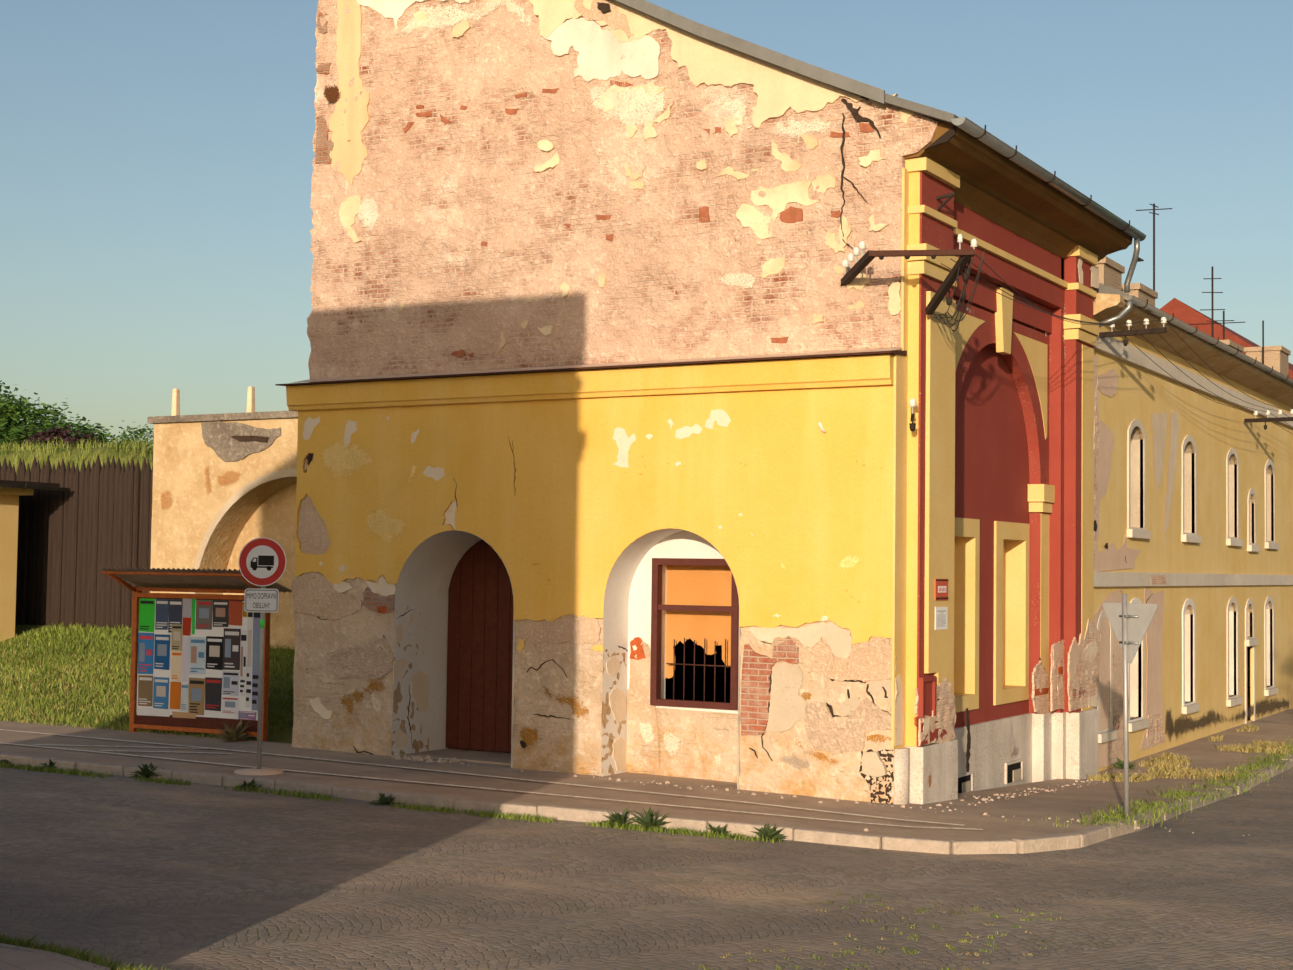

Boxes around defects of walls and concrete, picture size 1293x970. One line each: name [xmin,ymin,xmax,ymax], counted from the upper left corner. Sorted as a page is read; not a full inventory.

flaking render [307,0,939,382]
crack [840,96,881,248]
peeling [612,427,653,468]
peeling [667,409,731,439]
flaking render [1094,355,1141,572]
flaking render [290,494,429,757]
flaking render [513,614,660,776]
flaking render [739,614,956,804]
flaking render [1032,588,1166,768]